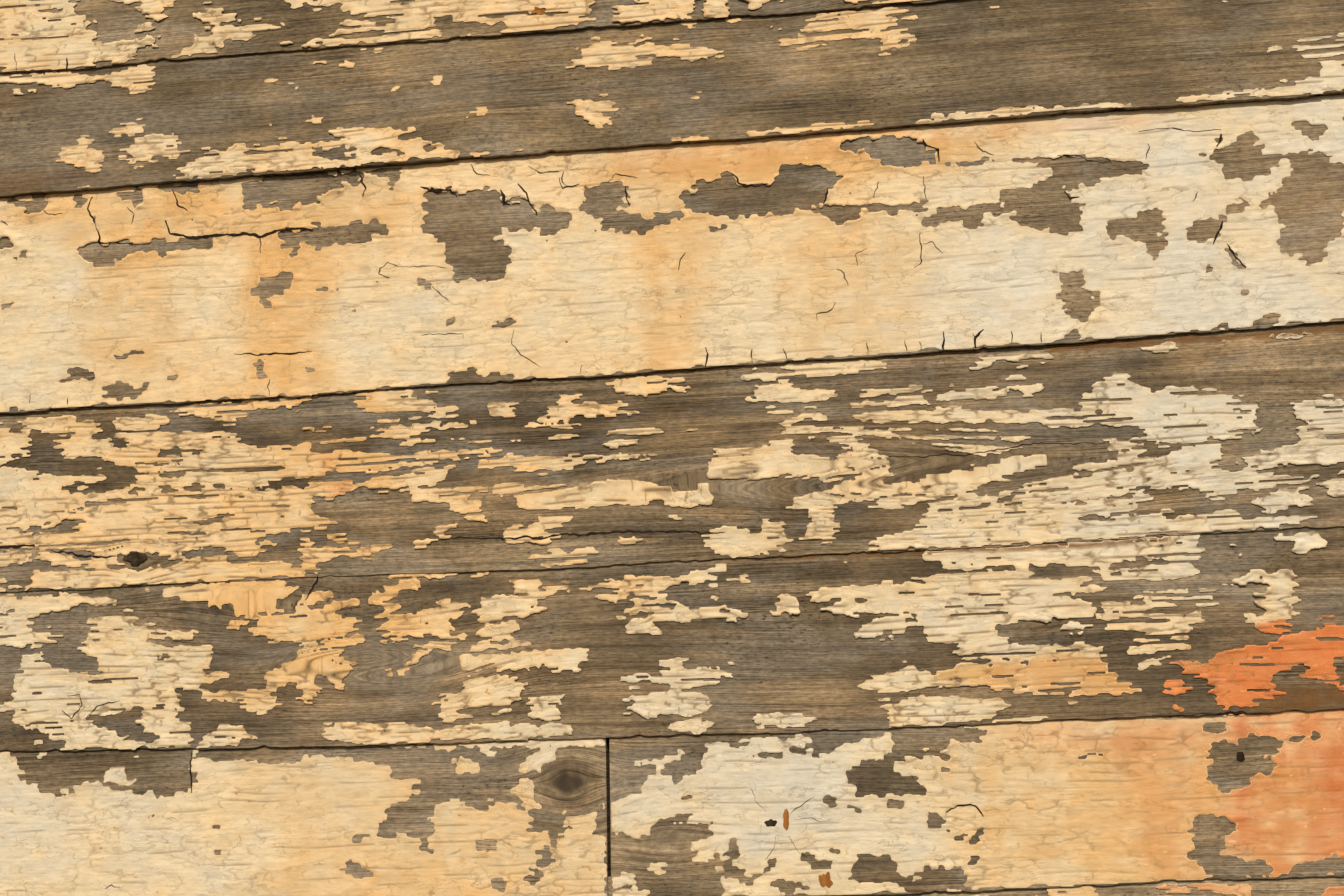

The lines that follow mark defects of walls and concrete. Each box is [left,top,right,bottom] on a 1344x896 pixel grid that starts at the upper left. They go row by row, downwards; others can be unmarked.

peeling [0,0,176,95]
peeling [171,0,783,70]
peeling [770,0,921,56]
peeling [0,33,1344,446]
peeling [0,372,1344,896]